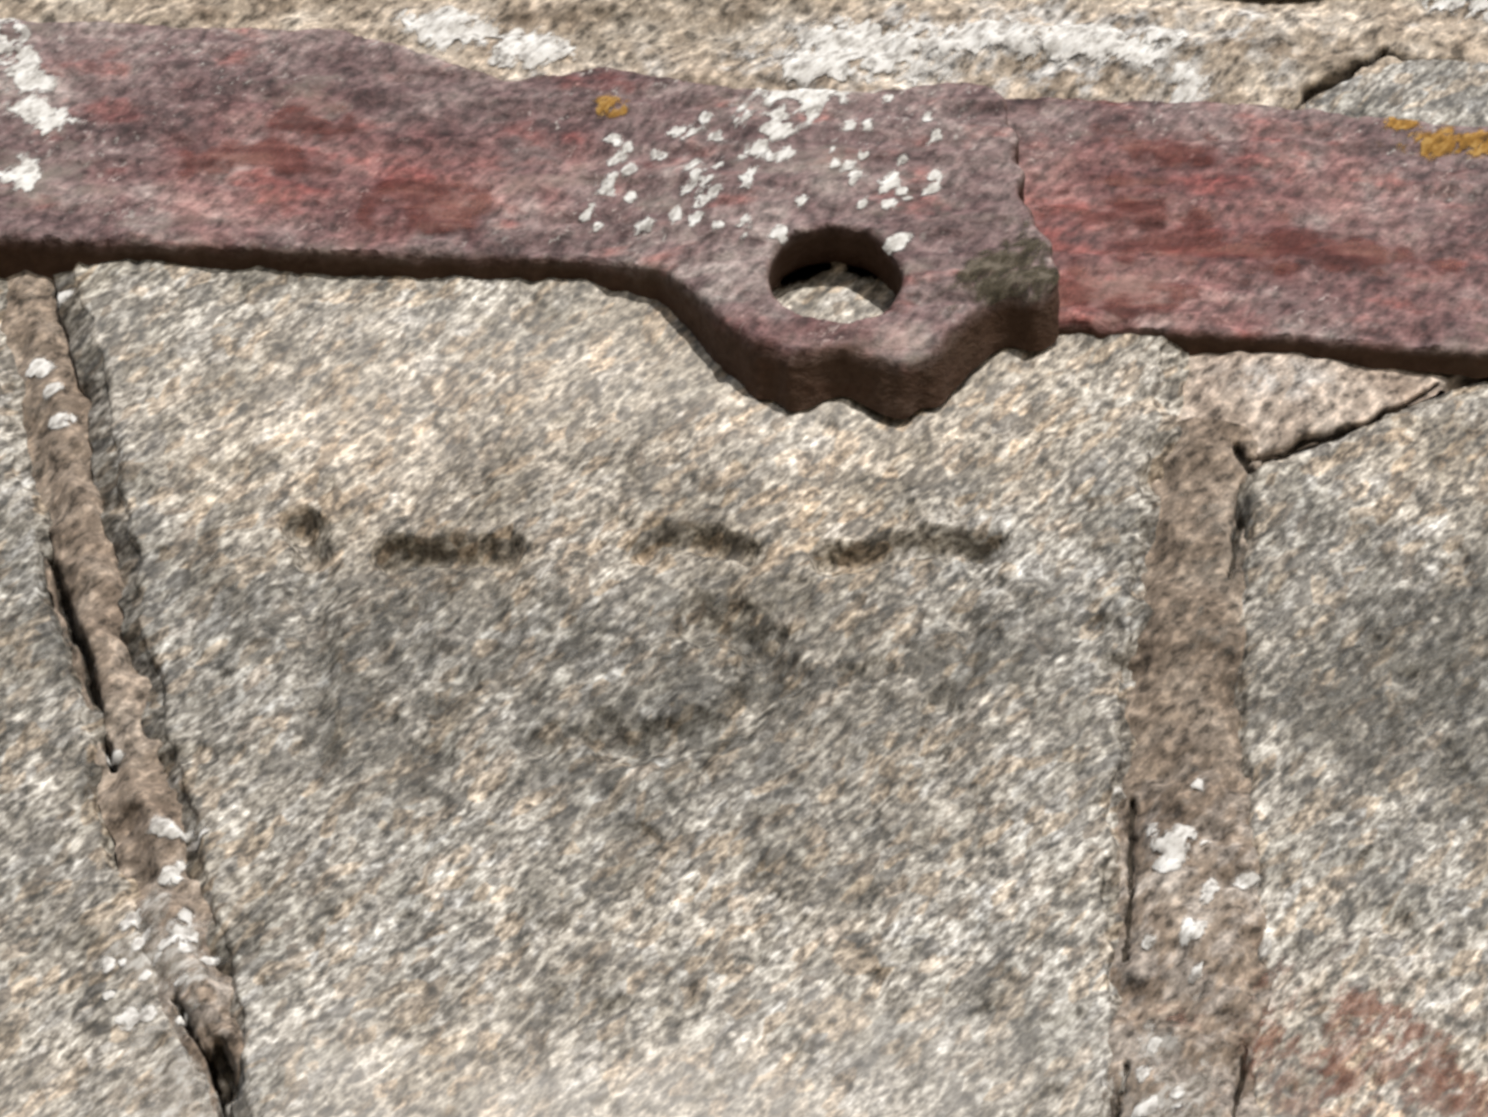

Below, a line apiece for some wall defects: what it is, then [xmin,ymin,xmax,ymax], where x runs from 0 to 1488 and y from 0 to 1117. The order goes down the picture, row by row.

crack [1227,386,1438,580]
crack [46,562,103,711]
crack [104,747,116,774]
crack [1122,799,1137,963]
crack [172,1000,238,1117]
crack [1112,1064,1130,1117]
crack [1232,1044,1248,1117]